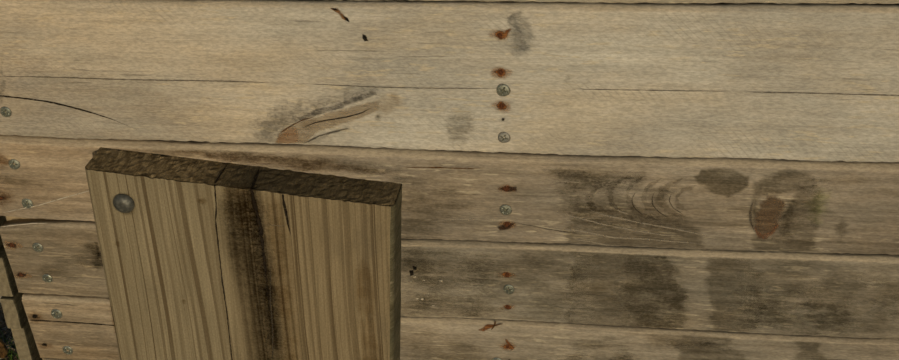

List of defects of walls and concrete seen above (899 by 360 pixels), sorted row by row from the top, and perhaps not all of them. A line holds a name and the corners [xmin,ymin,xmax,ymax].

crack [214,165,233,360]
damp [226,193,276,360]